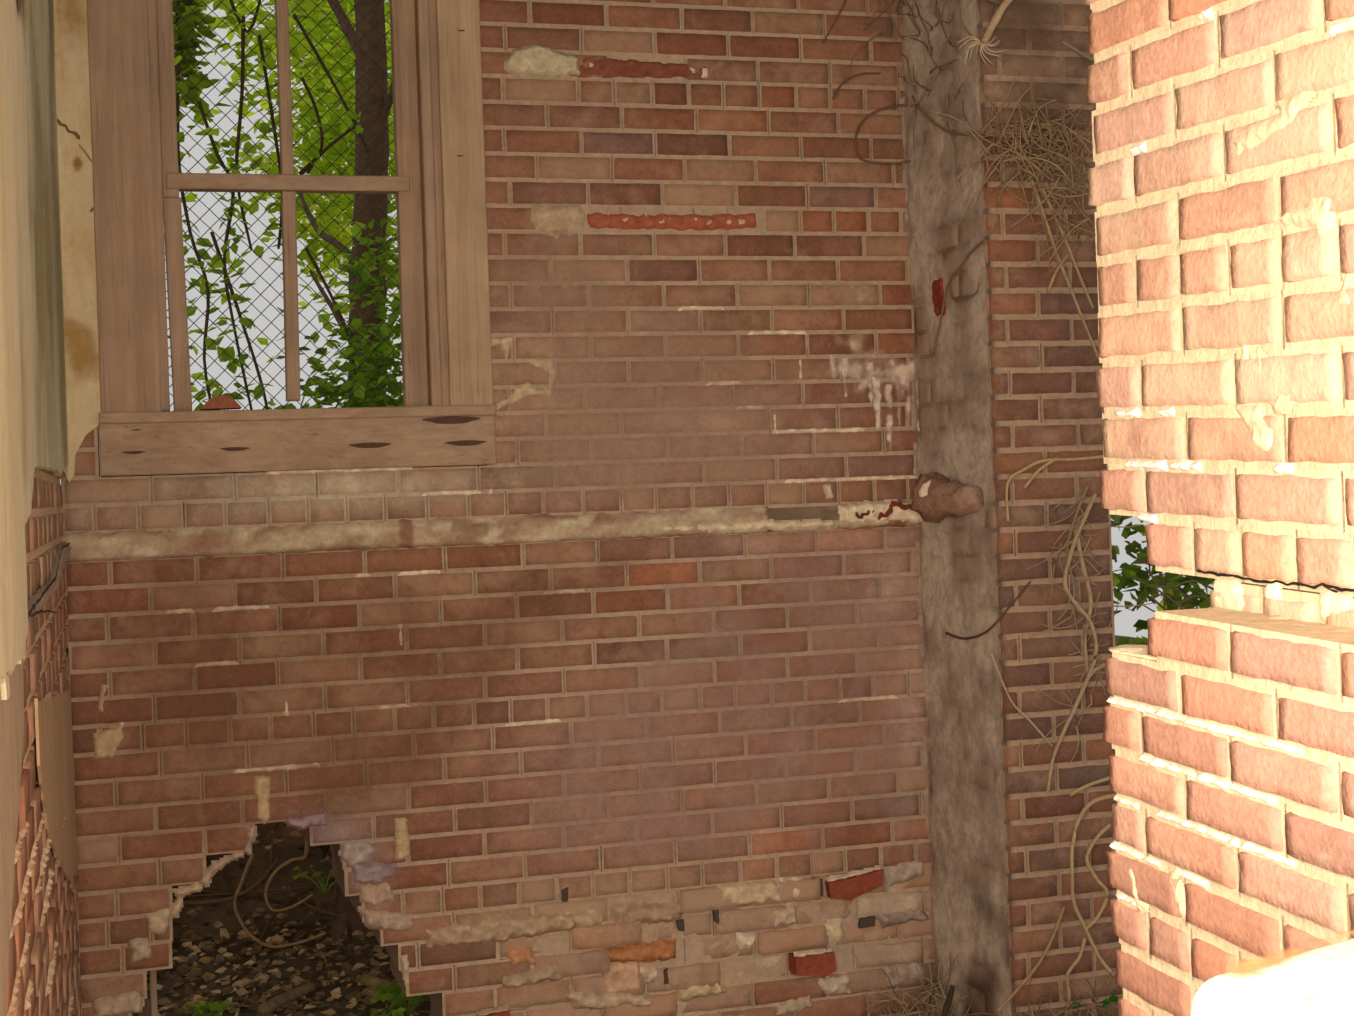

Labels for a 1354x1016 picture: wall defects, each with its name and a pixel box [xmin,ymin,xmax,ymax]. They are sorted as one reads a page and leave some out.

damp [830,339,920,476]
flaking render [0,0,69,1016]
crack [1196,569,1354,593]
spalling [285,811,328,830]
spalling [128,824,257,963]
spalling [338,840,726,1016]
spalling [736,932,756,950]
spalling [713,876,823,928]
spalling [825,905,929,943]
spalling [883,860,924,887]
spalling [92,991,145,1016]
spalling [769,971,851,1015]